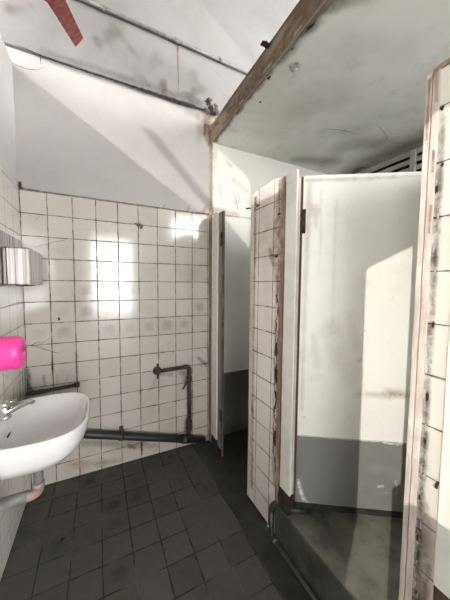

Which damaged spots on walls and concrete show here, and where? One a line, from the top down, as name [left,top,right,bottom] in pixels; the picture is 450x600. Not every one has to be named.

corrosion [204,0,340,144]